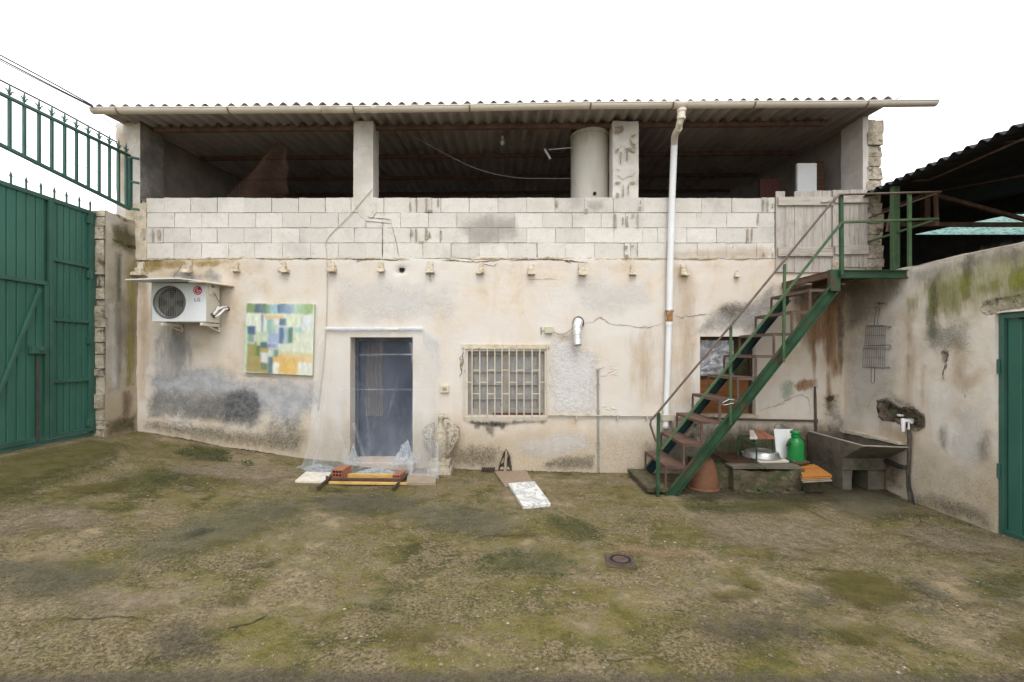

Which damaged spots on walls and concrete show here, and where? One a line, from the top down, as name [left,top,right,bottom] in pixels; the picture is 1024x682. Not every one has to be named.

leakage [149,337,314,448]
rust [797,292,843,410]
spalling [876,398,925,432]